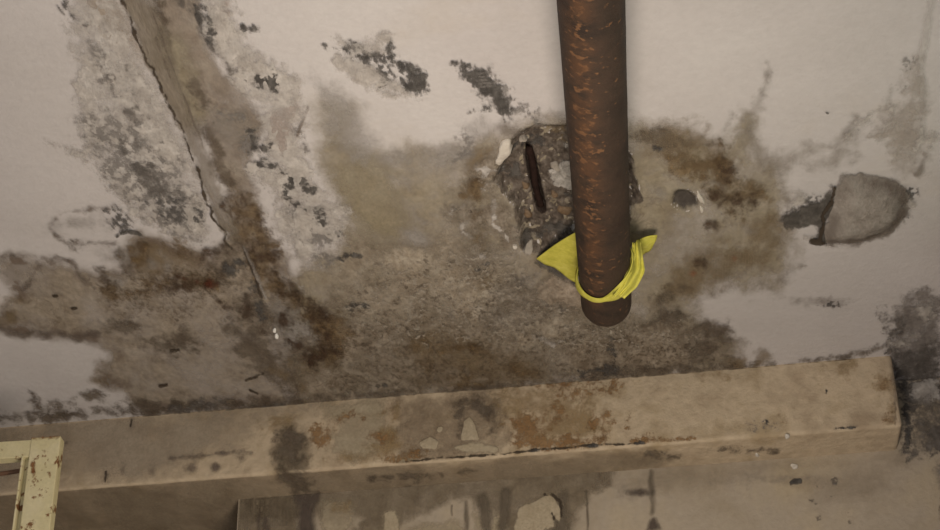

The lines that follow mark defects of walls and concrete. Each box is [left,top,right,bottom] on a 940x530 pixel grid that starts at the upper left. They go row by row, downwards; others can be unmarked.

crack [120,0,263,298]
spalling [628,152,643,206]
rust [637,128,768,214]
damp [0,0,788,482]
spalling [442,124,581,348]
rust [500,379,696,452]
rust [687,321,732,362]
damp [807,288,940,462]
damp [0,495,16,530]
damp [54,426,663,530]
peeling [383,510,399,530]
peeling [514,493,563,530]